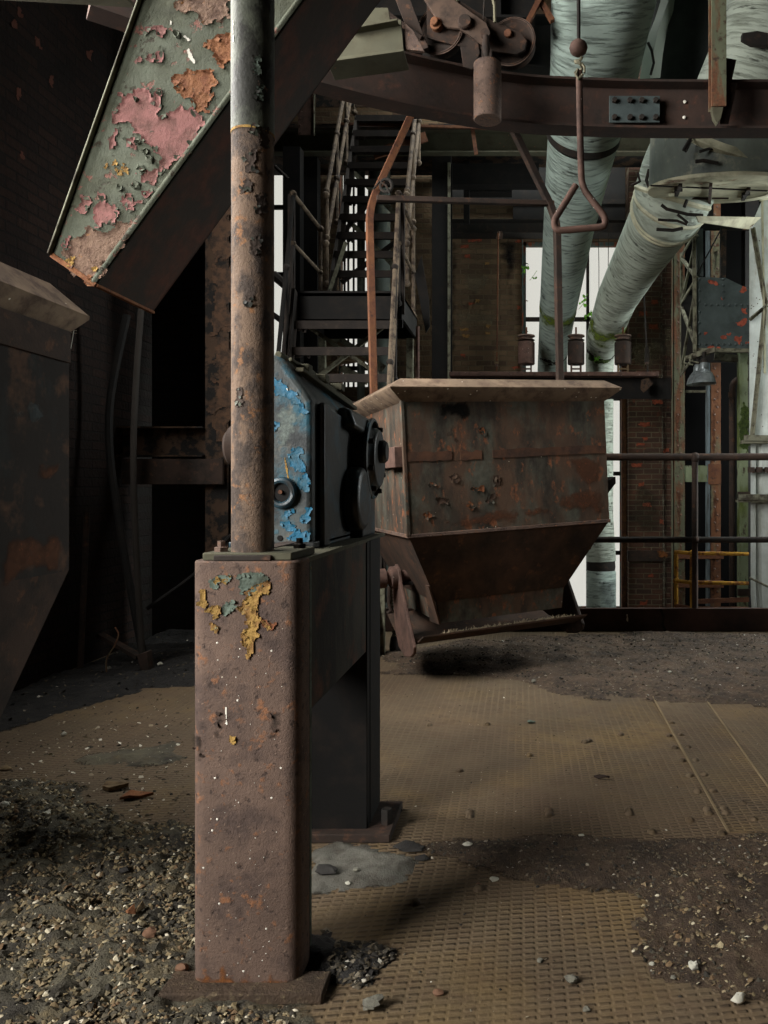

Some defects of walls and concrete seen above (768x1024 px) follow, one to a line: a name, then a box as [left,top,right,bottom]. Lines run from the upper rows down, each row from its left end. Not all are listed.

peeling [134,25,167,64]
peeling [74,86,205,229]
peeling [196,571,277,659]